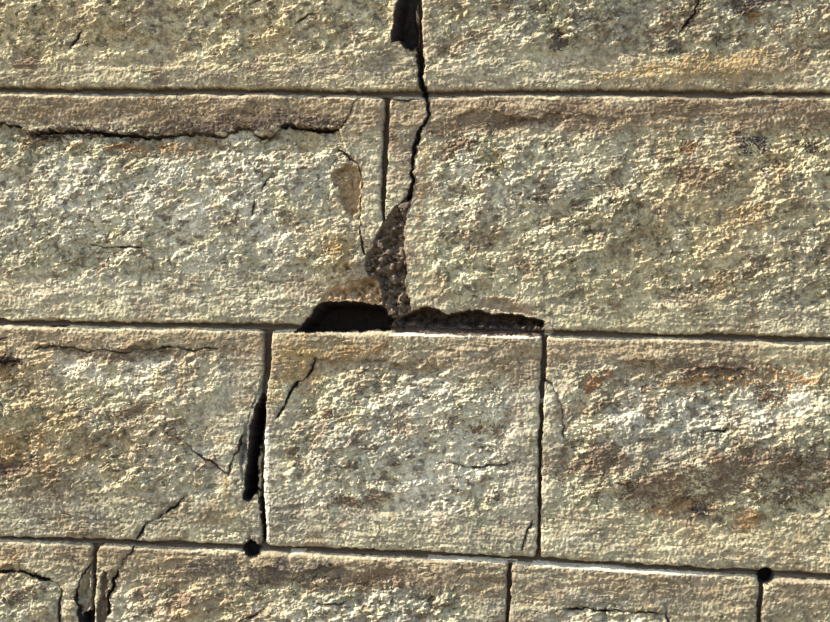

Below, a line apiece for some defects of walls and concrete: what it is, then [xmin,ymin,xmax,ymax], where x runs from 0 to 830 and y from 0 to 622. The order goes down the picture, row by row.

crack [391,50,431,199]
crack [0,99,365,254]
peeling [294,193,546,338]
crack [34,345,216,354]
crack [277,359,316,417]
crack [186,435,243,474]
crack [258,495,267,540]
crack [104,498,183,622]
crack [0,563,92,622]